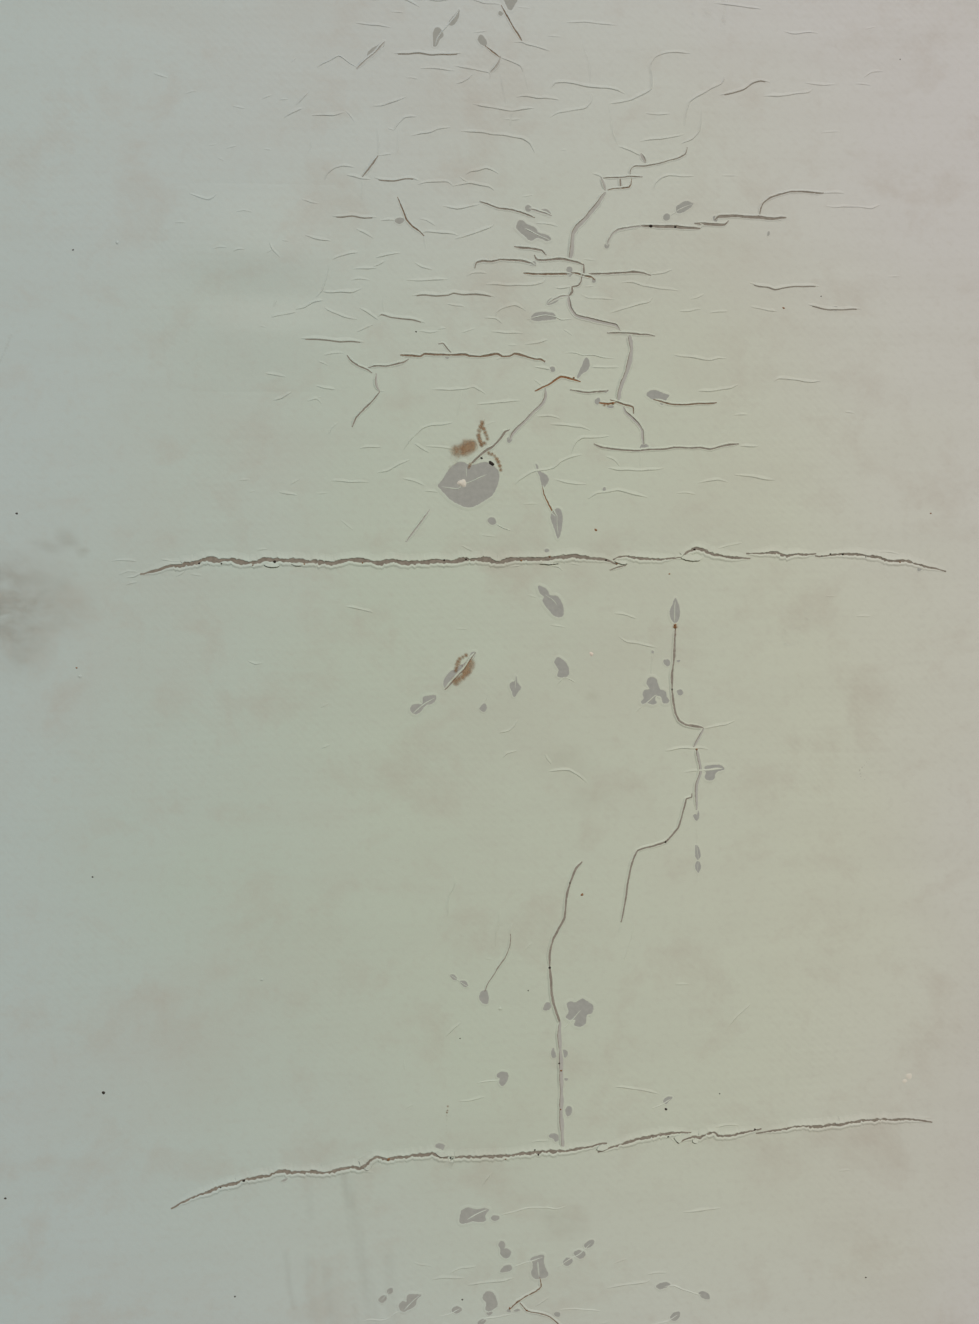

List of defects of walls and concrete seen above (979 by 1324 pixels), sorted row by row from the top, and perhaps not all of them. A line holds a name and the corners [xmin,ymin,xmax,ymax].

crack [112,0,946,585]
peeling [434,458,512,531]
peeling [636,658,685,712]
crack [614,611,735,933]
crack [170,861,933,1210]
peeling [541,995,597,1031]
peeling [456,1204,566,1227]
peeling [496,1238,596,1282]
peeling [360,1286,424,1323]
peeling [476,1289,521,1324]